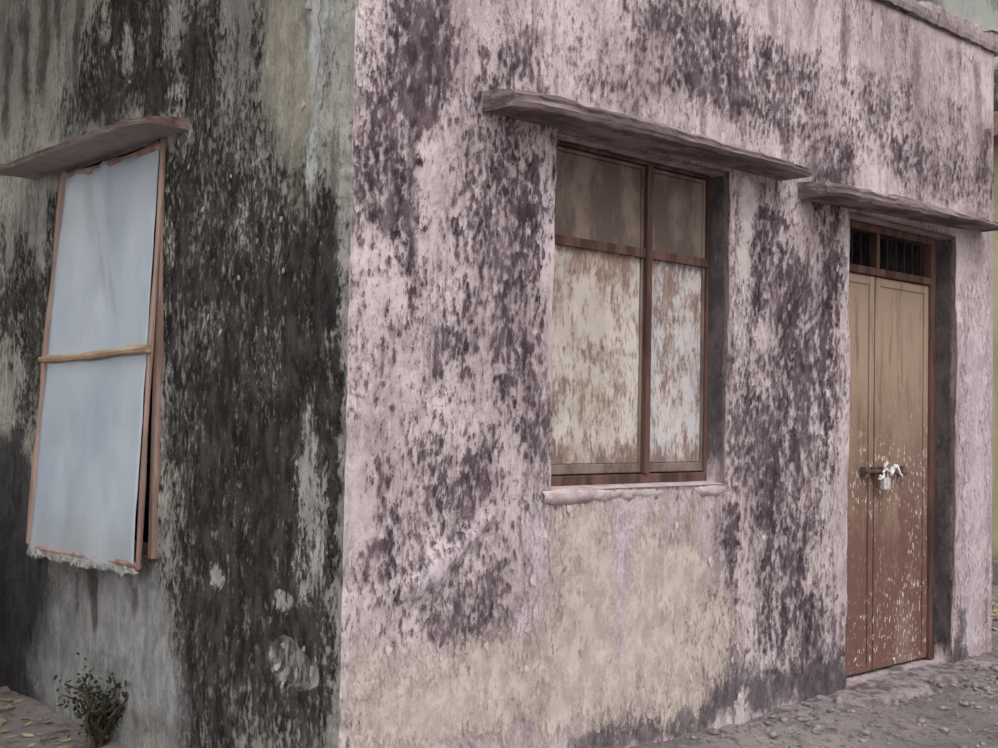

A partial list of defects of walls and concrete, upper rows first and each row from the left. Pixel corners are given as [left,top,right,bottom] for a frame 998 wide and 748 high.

crack [313,0,333,99]
damp [552,0,994,213]
crack [875,0,994,53]
damp [0,0,562,748]
damp [568,176,865,748]